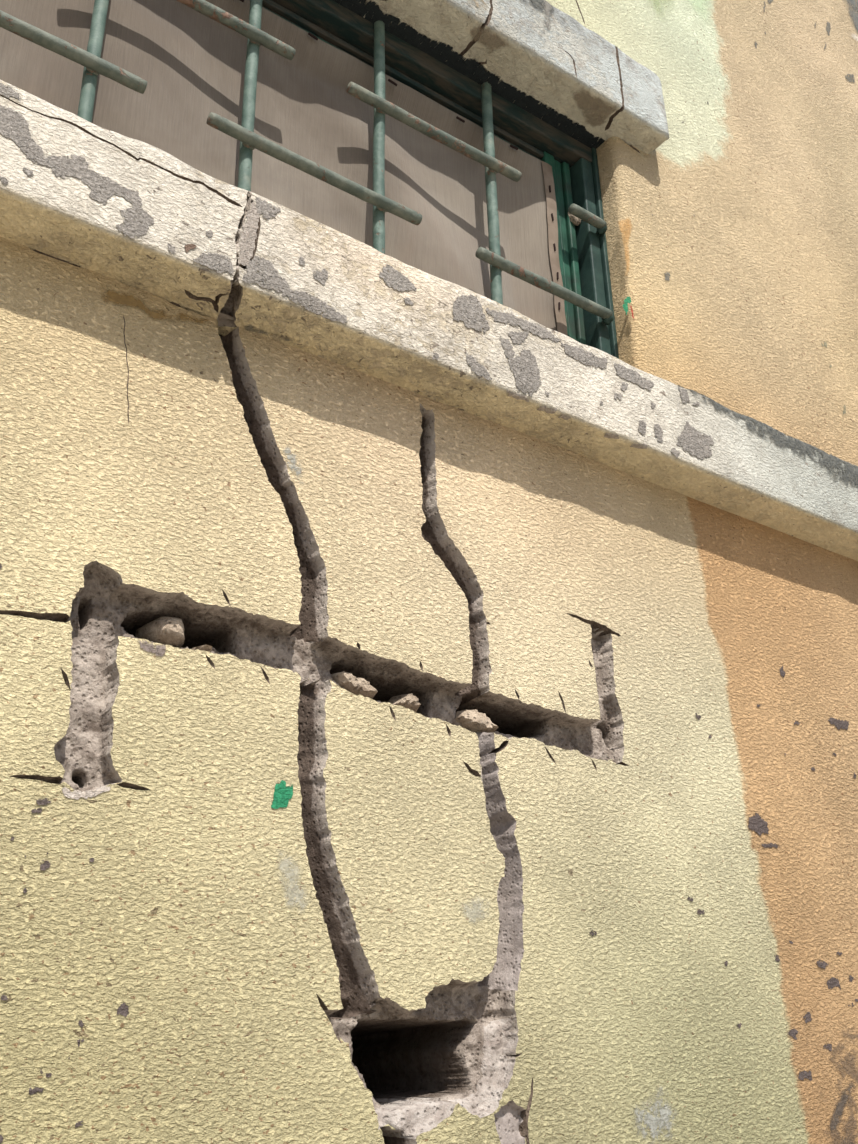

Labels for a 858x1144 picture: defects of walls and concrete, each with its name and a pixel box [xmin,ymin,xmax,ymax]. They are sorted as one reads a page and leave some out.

peeling [0,82,154,238]
crack [459,0,493,65]
crack [605,46,640,153]
crack [0,94,329,642]
crack [419,403,492,706]
crack [297,679,380,1019]
crack [462,732,524,991]
crack [380,1126,417,1144]
spalling [316,979,526,1144]
crack [519,1078,533,1144]
leakage [830,1084,853,1144]